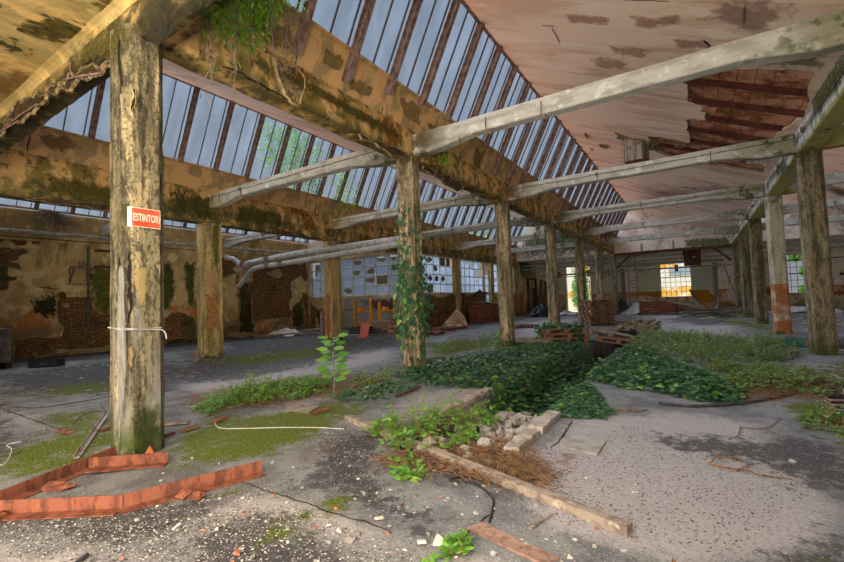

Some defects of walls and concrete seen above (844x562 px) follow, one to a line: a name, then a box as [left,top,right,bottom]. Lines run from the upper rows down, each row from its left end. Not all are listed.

water stain [568,15,607,25]
water stain [632,16,678,28]
water stain [716,1,776,30]
water stain [322,49,343,70]
spalling [0,60,111,137]
water stain [349,79,373,96]
water stain [400,97,436,130]
flaking render [0,239,40,291]
flaking render [247,263,308,324]
peeling [302,258,399,333]
flaking render [13,291,110,358]
water stain [117,268,126,435]